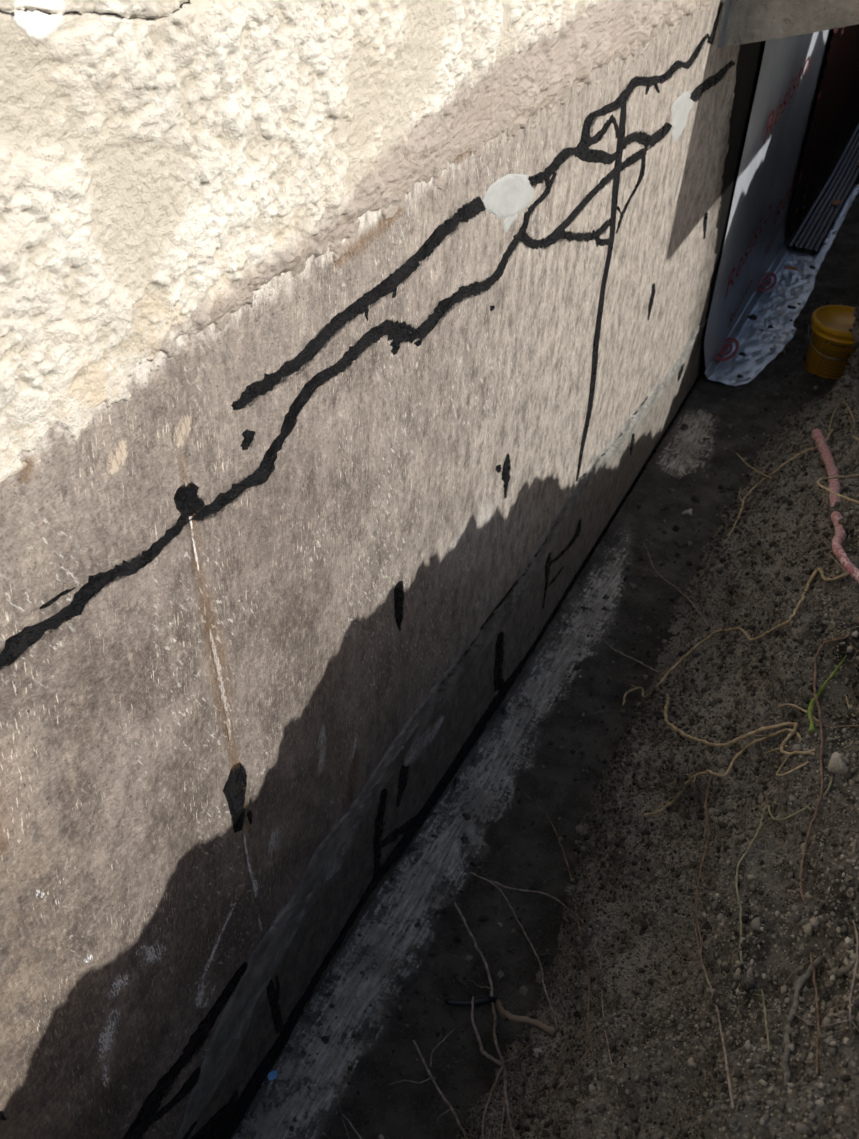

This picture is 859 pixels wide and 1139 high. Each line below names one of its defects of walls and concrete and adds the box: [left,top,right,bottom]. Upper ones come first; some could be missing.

crack [0,0,735,671]
crack [493,631,506,691]
crack [122,962,284,1139]